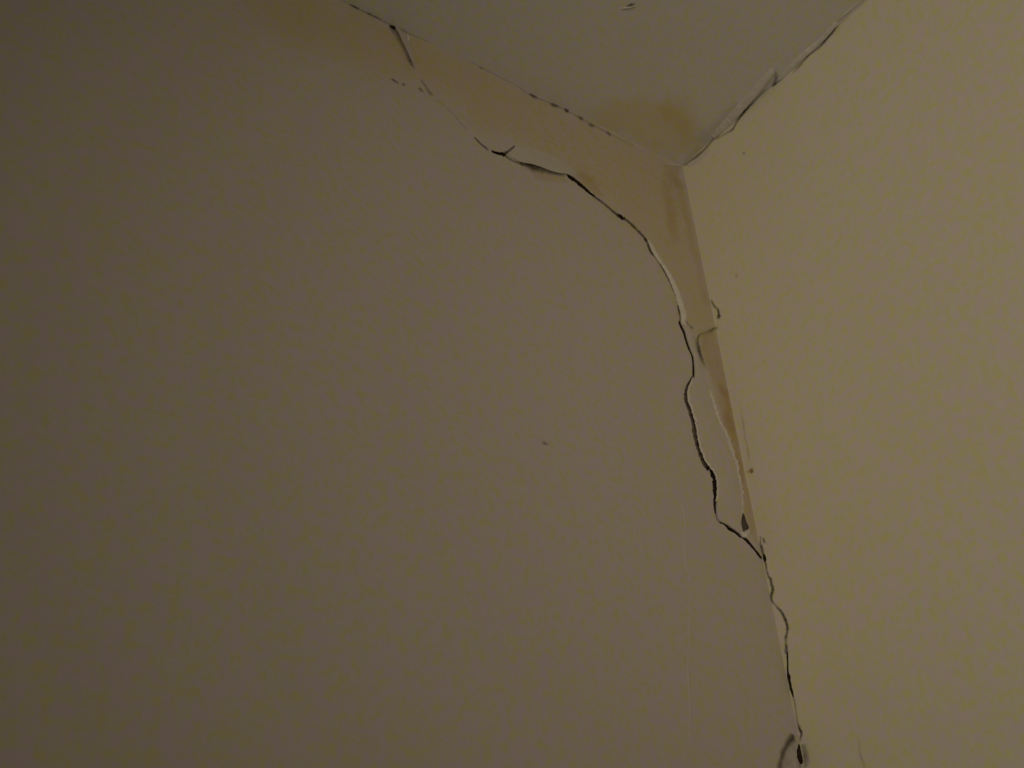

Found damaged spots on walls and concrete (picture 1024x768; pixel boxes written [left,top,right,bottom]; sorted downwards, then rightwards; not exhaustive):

peeling [507,146,578,178]
crack [478,141,794,697]
peeling [683,324,750,538]